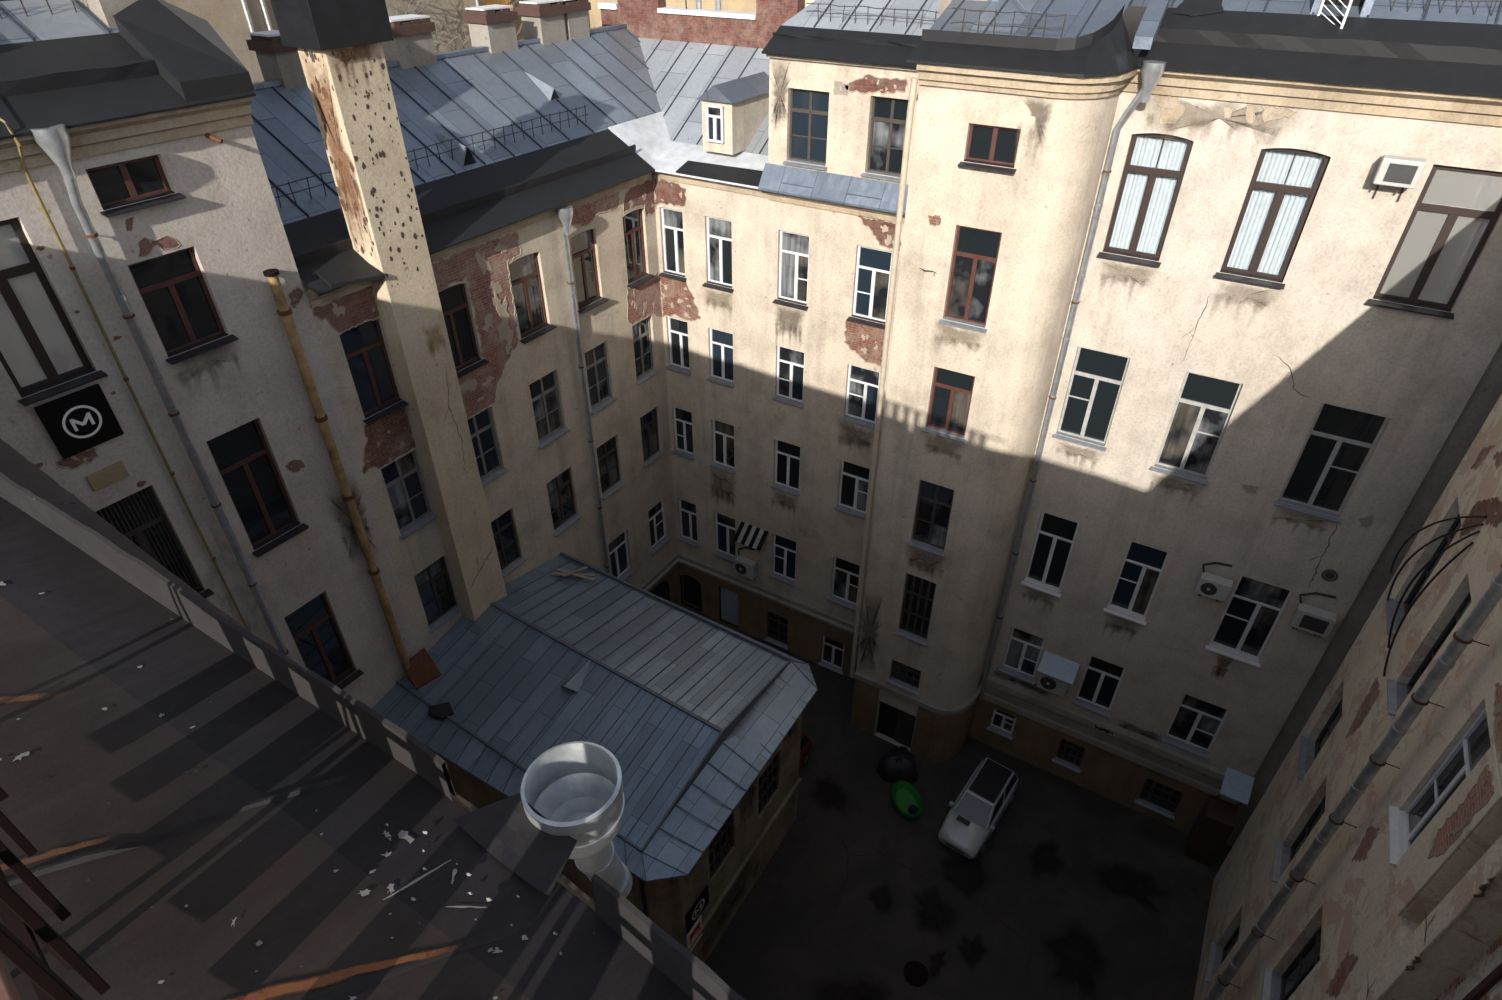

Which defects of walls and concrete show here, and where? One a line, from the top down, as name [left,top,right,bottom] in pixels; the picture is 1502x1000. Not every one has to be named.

flaking render [570,178,687,227]
flaking render [288,49,521,420]
flaking render [626,272,701,325]
flaking render [844,318,885,367]
flaking render [1428,682,1502,859]